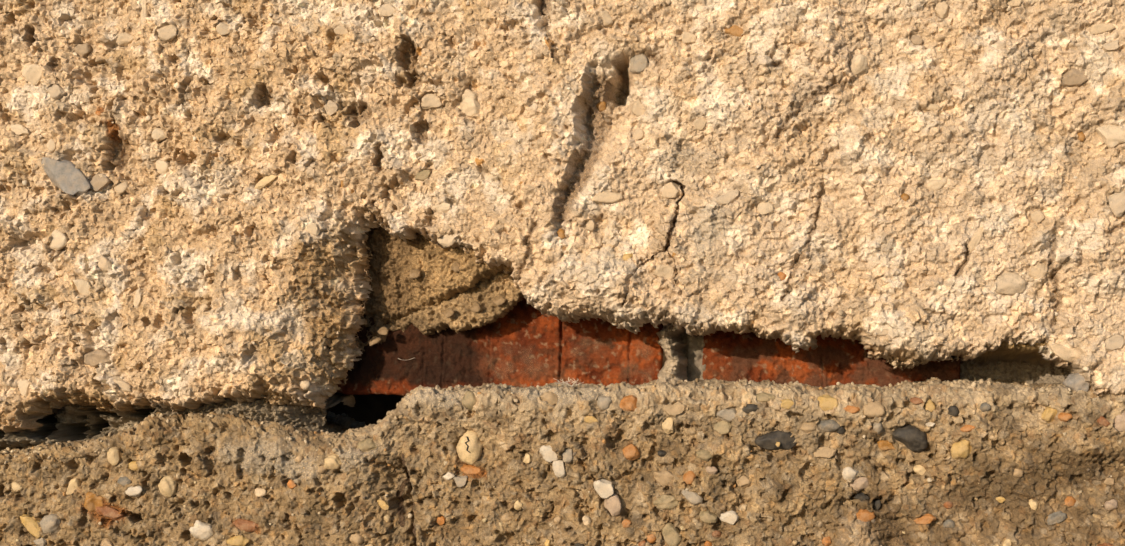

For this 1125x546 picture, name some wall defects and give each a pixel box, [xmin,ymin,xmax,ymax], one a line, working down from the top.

spalling [356,223,524,351]
crack [396,453,416,537]